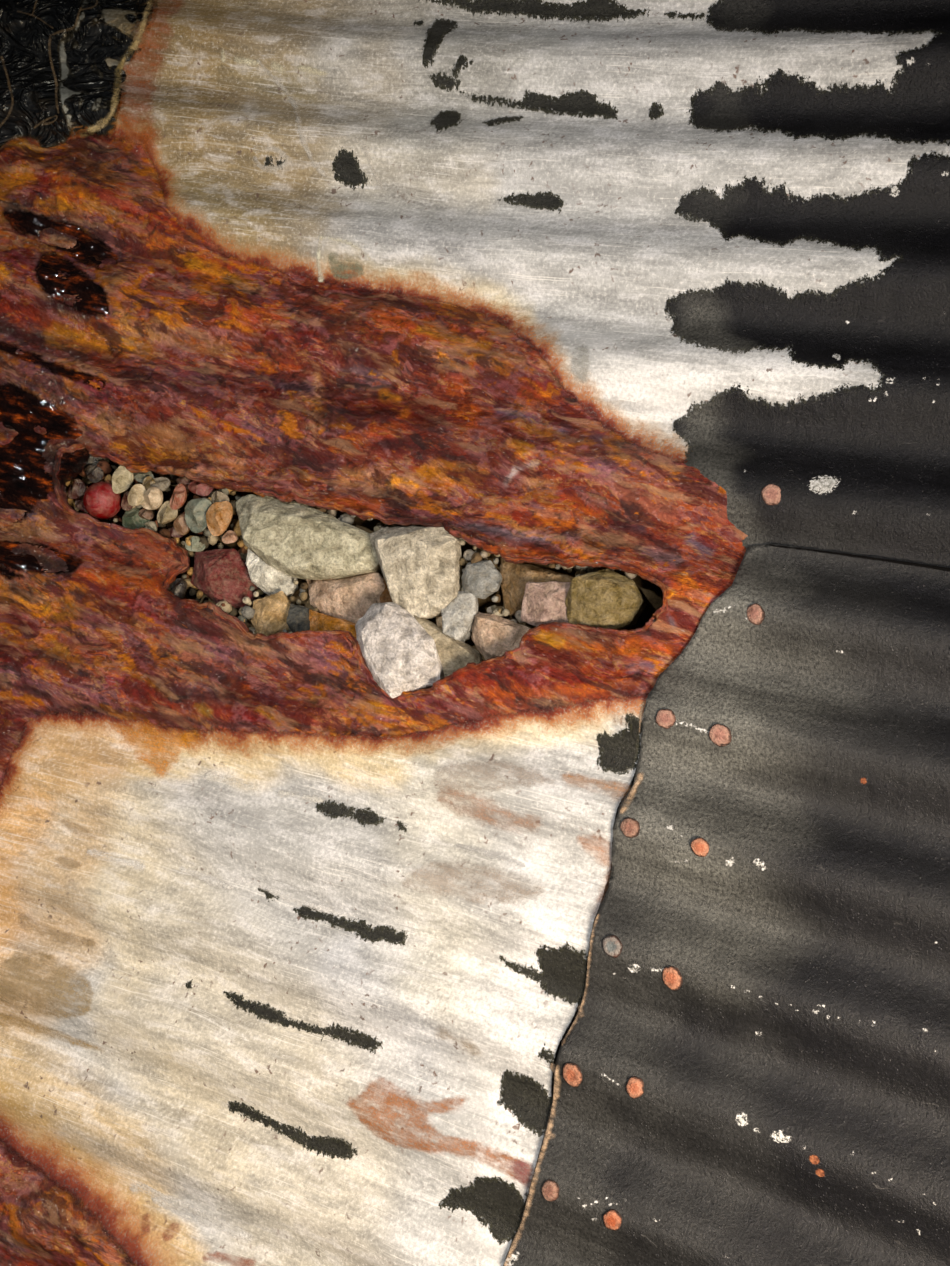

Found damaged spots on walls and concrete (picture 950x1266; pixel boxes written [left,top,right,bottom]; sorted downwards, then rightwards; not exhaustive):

peeling [430,110,462,133]
peeling [414,0,650,128]
peeling [649,102,664,121]
leakage [3,209,118,317]
peeling [664,0,950,567]
rust [0,0,748,813]
rust [439,791,536,827]
rust [0,1114,173,1266]